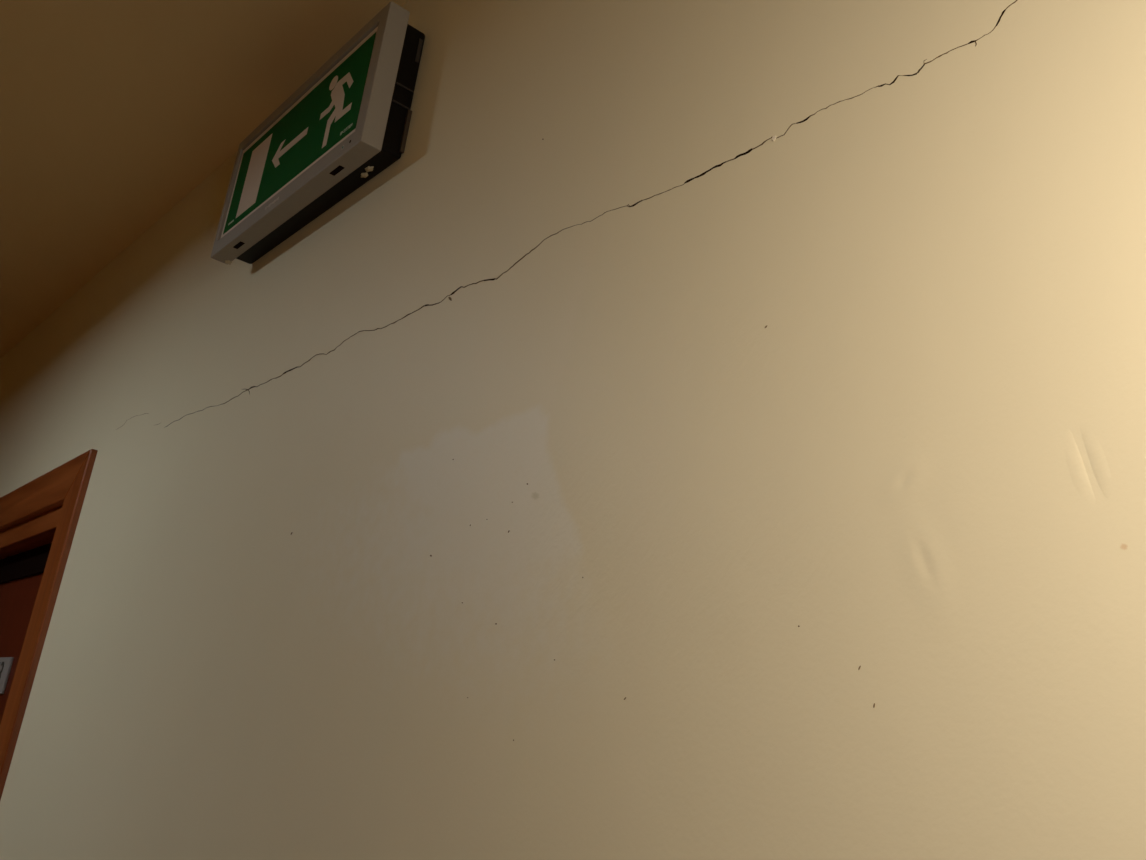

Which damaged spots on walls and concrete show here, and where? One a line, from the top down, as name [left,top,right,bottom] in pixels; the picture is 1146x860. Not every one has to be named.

crack [116,0,1017,430]